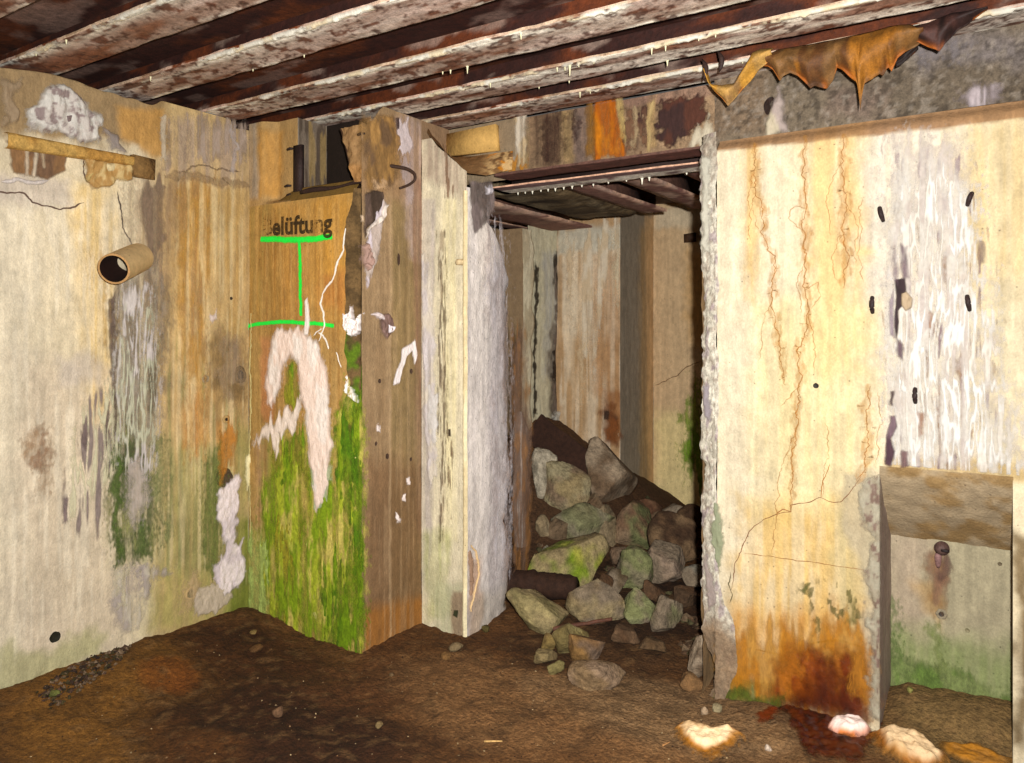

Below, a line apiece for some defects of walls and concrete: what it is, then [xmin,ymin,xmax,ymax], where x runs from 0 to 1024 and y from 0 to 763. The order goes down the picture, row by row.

crack [0,160,89,210]
spalling [1,79,133,188]
crack [117,194,132,244]
damp [105,115,171,523]
damp [187,112,247,172]
spalling [342,116,401,434]
rust [572,93,710,160]
rust [790,139,810,508]
damp [195,298,333,615]
crack [728,465,861,602]
rust [926,554,950,607]
rust [731,613,882,762]